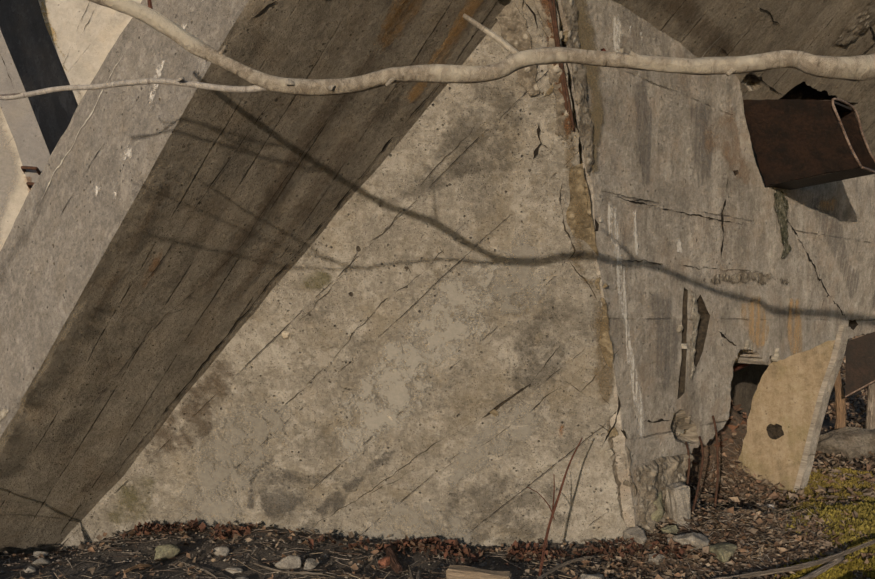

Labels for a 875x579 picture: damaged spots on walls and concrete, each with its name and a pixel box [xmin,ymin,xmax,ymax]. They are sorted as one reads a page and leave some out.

crack [516,125,554,163]
spalling [741,74,761,91]
spalling [780,81,858,108]
crack [612,180,749,271]
crack [787,219,848,324]
spalling [677,288,710,399]
crack [448,349,669,466]
crack [305,419,476,531]
spalling [604,409,699,534]